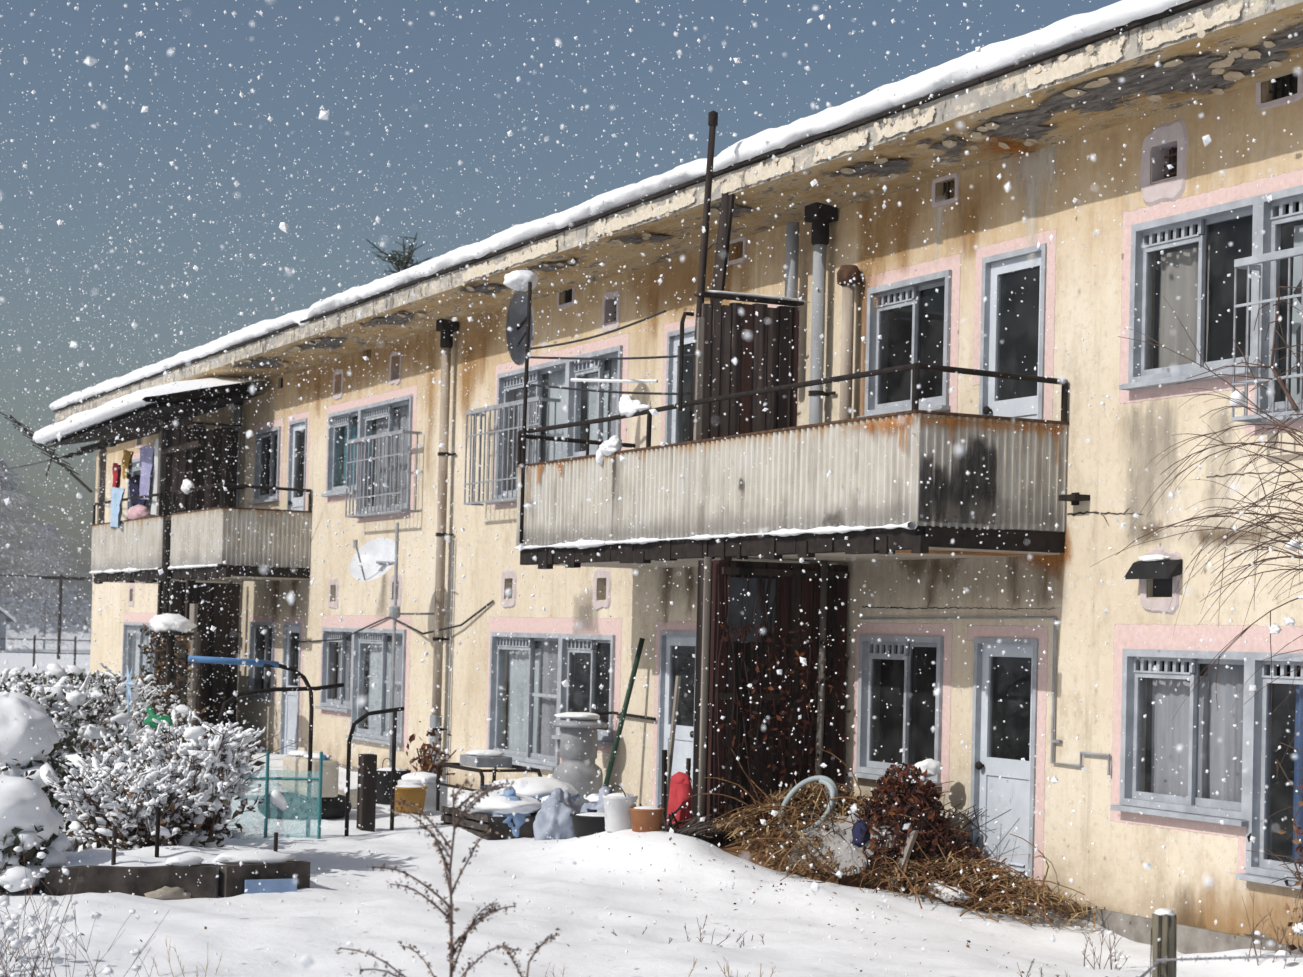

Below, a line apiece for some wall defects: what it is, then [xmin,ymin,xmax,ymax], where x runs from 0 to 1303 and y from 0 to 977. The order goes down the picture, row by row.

spalling [813,0,1303,182]
peeling [593,187,695,247]
peeling [710,157,793,218]
corrosion [864,416,1064,457]
leakage [920,440,997,524]